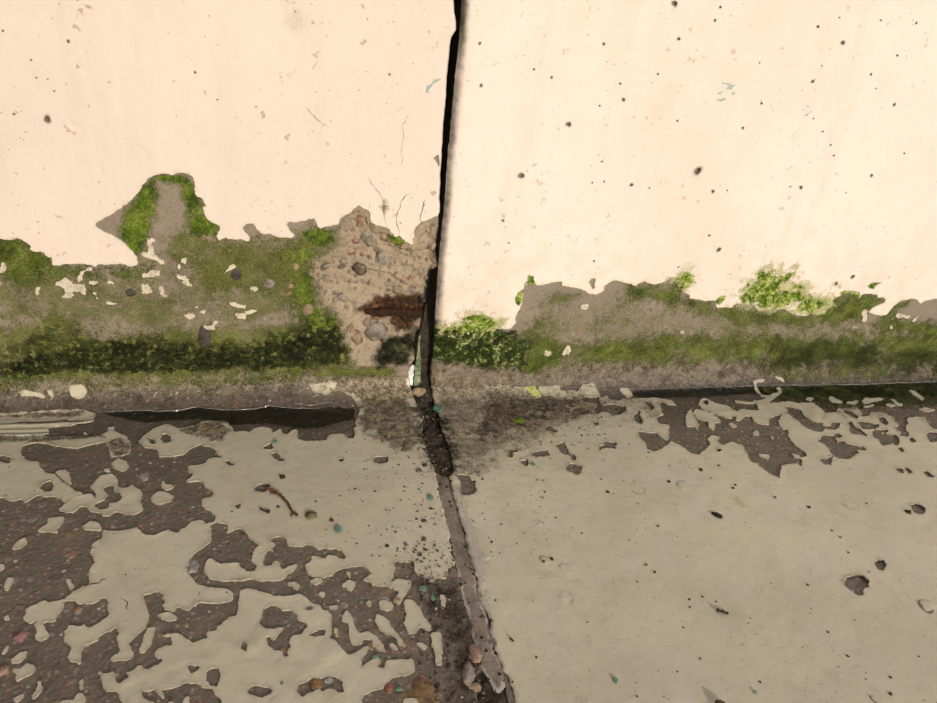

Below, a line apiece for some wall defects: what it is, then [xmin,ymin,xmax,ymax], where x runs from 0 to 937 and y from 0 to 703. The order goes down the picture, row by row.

peeling [0,173,482,703]
corrosion [358,293,425,332]
peeling [430,277,937,478]